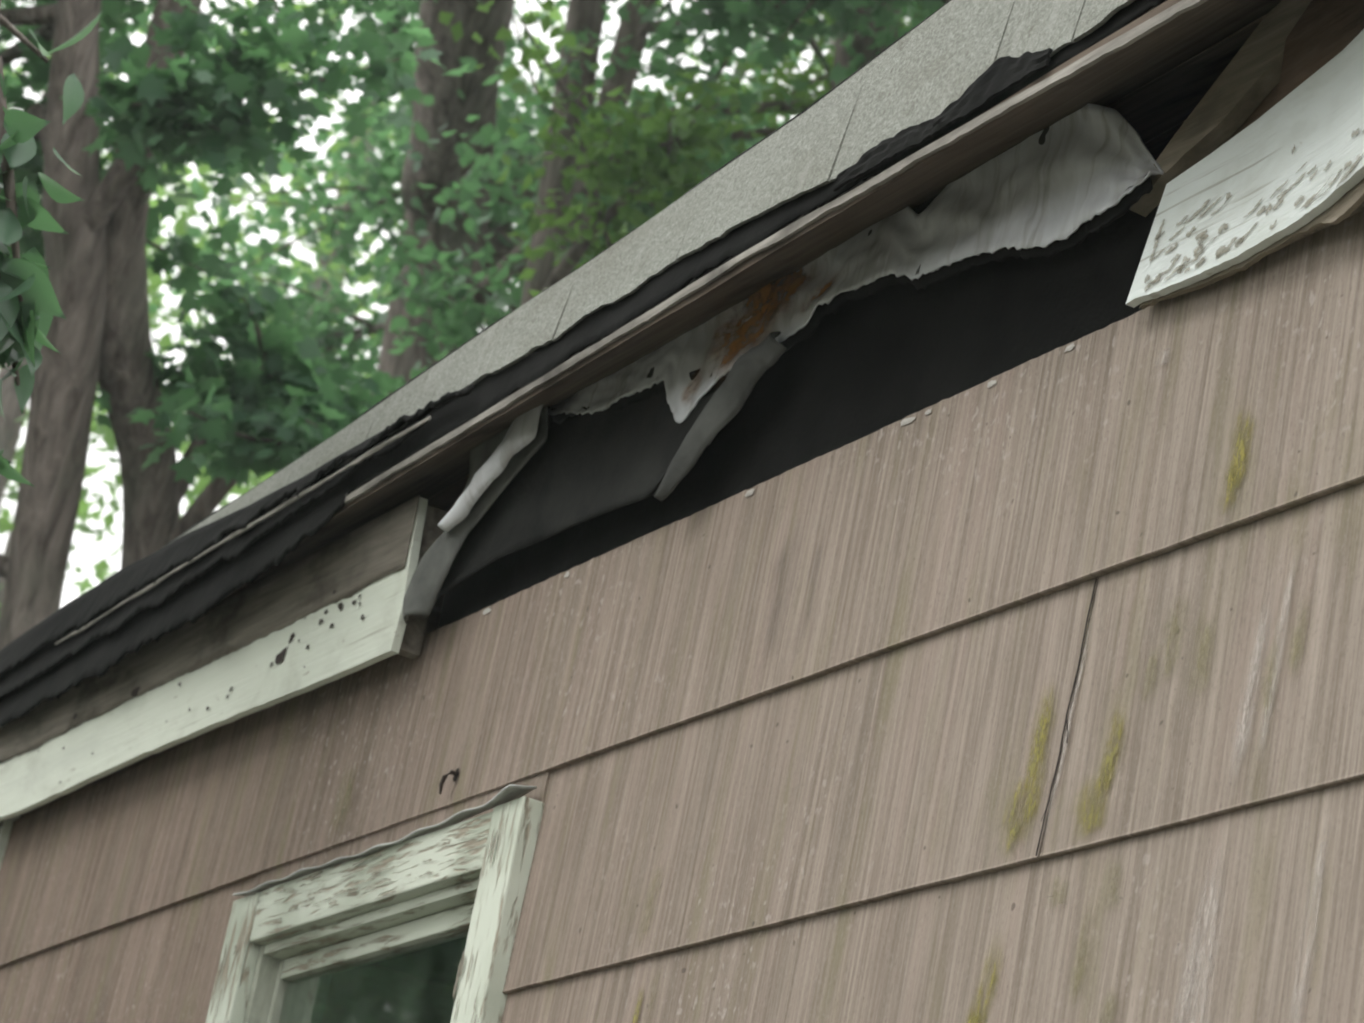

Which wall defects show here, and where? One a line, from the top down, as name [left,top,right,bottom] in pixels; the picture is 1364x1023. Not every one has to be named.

corrosion [713,268,833,368]
crack [1035,579,1097,856]
peeling [453,951,477,1023]